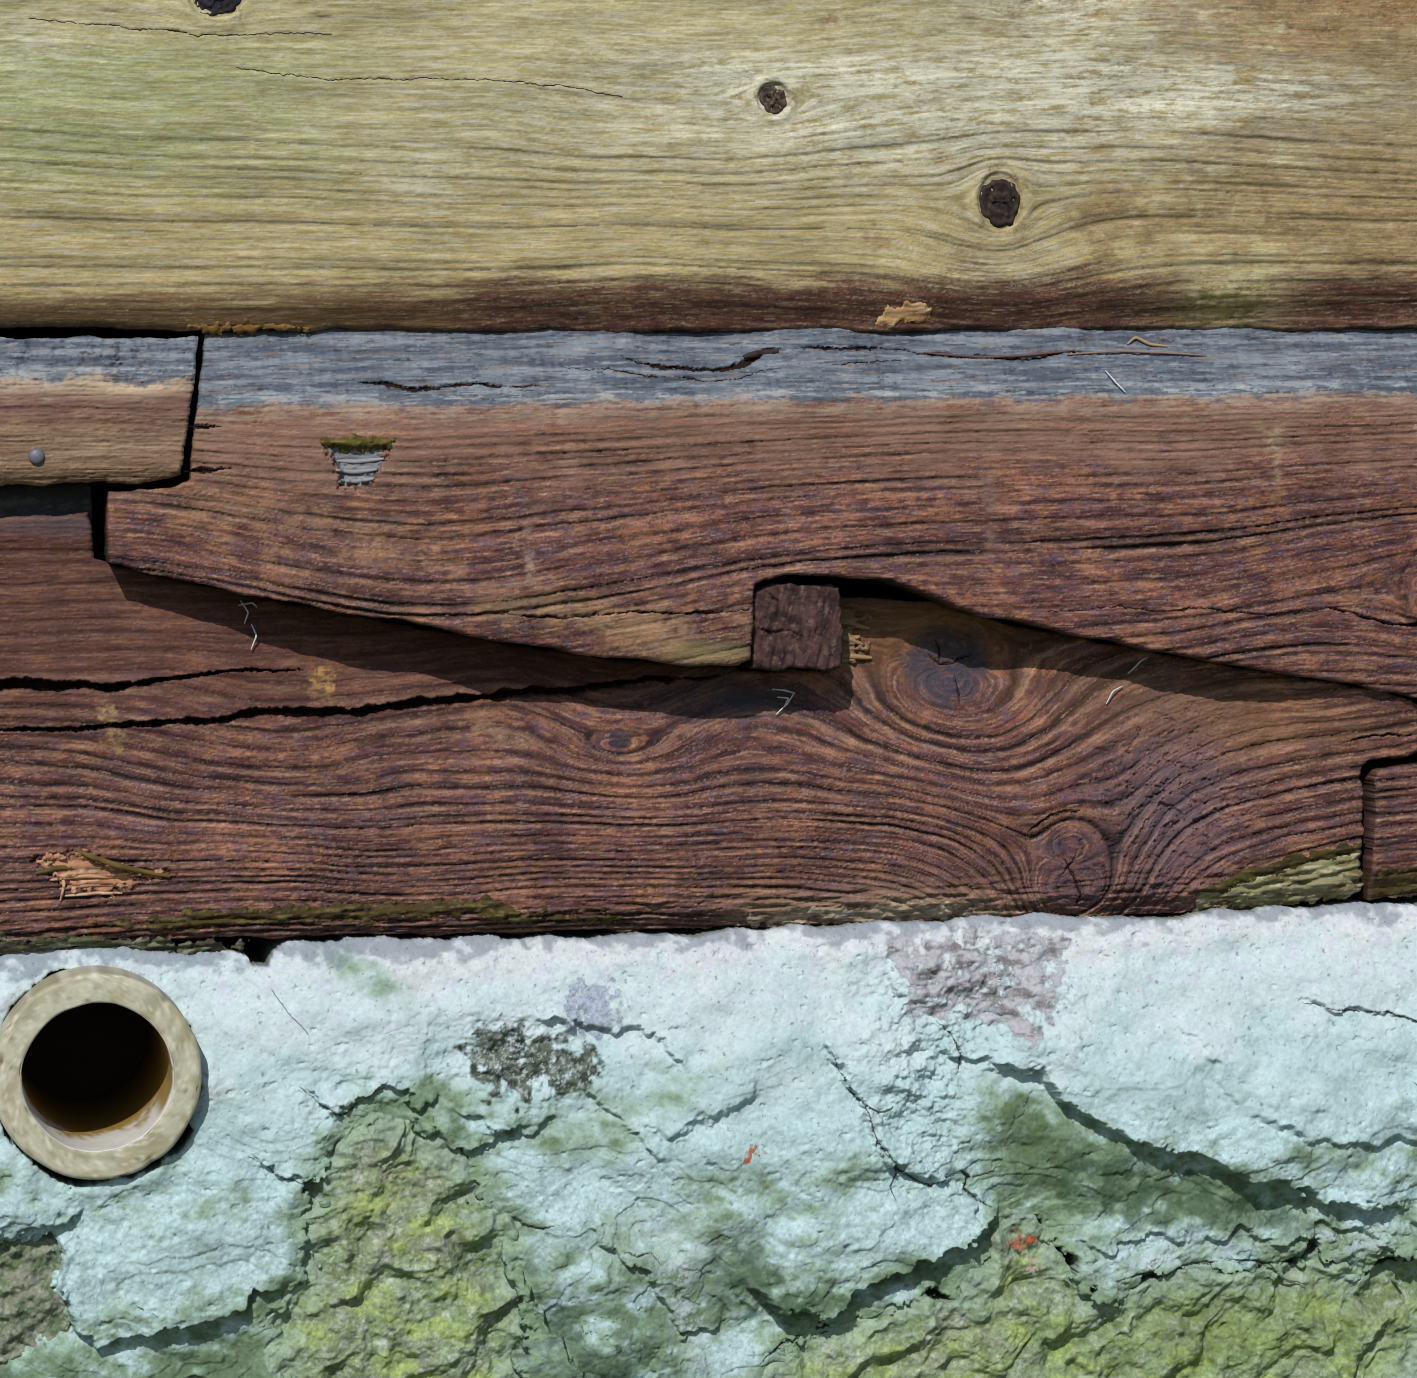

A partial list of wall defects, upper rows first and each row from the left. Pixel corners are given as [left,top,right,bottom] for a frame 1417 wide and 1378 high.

crack [359,346,1116,393]
crack [0,668,714,732]
crack [937,1022,962,1069]
crack [1304,1003,1417,1022]
crack [832,1054,1002,1207]
spalling [0,1225,73,1363]
spalling [258,1107,540,1378]
spalling [762,1208,1417,1378]